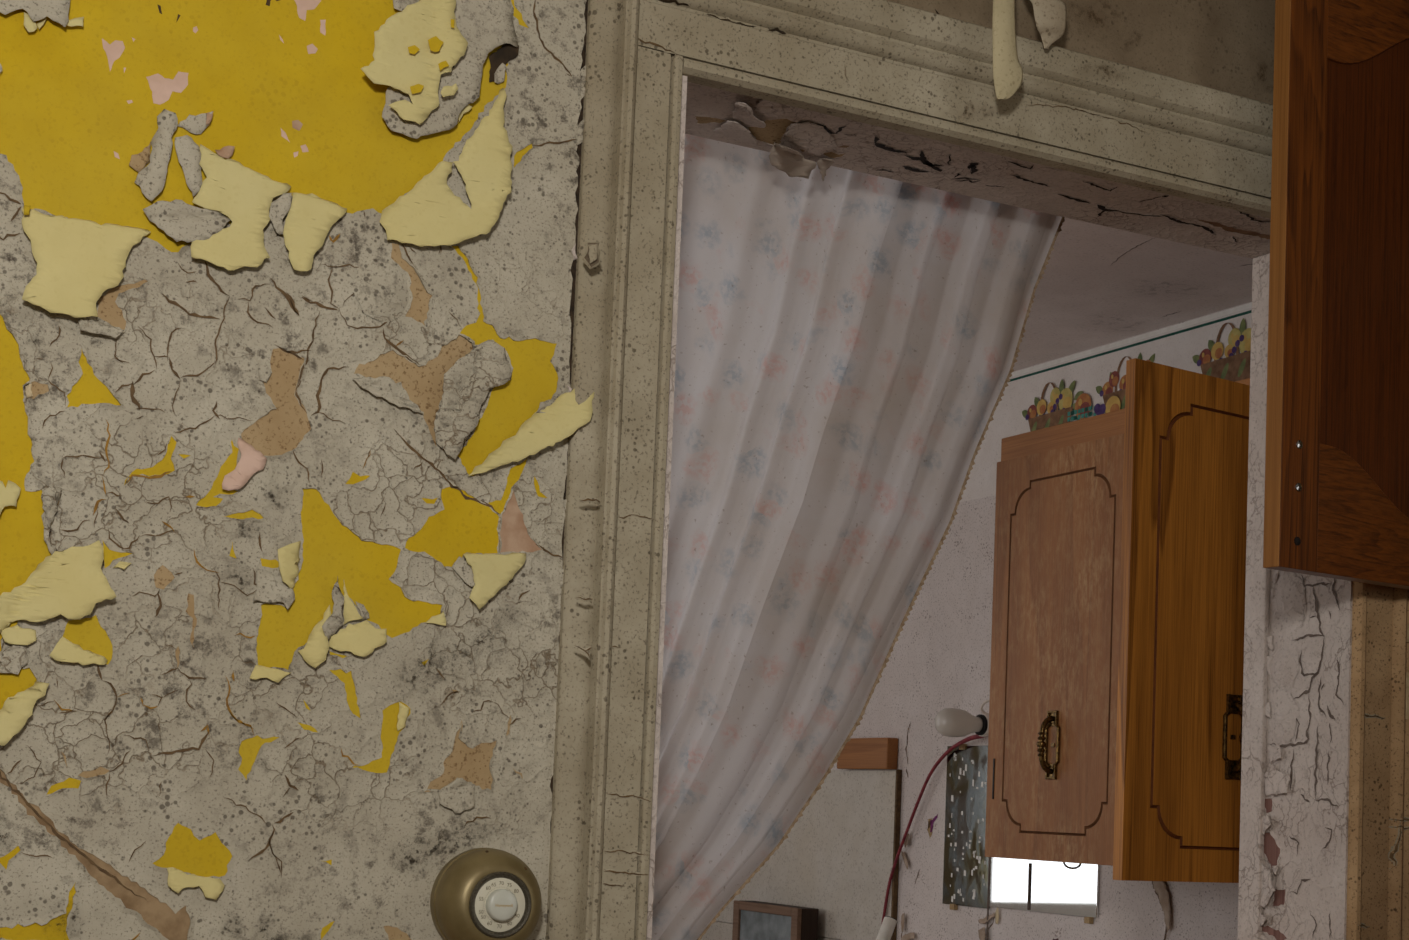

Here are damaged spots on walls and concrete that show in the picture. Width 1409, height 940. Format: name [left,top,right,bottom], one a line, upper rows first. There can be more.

crack [0,191,21,242]
peeling [692,99,853,181]
crack [816,122,1271,266]
peeling [0,0,600,784]
crack [35,212,498,878]
peeling [419,723,497,813]
crack [434,667,523,780]
crack [1268,574,1385,940]
peeling [0,875,84,940]
crack [0,744,196,940]
peeling [148,819,237,900]
peeling [1259,744,1291,940]